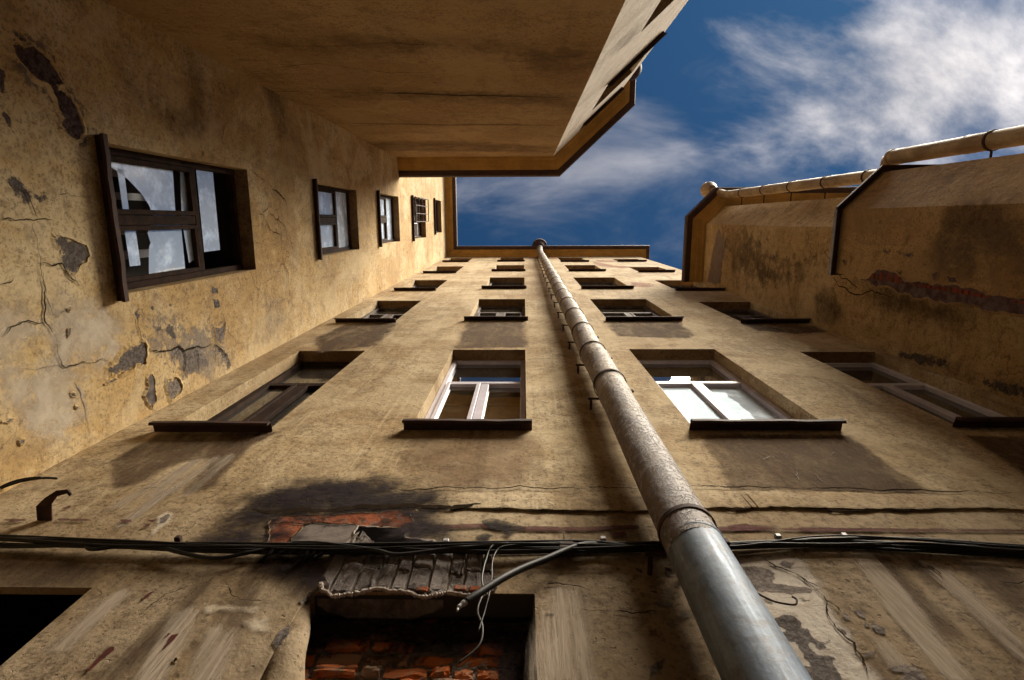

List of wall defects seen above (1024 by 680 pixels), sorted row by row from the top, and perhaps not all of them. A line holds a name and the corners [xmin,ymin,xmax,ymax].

peeling [0,30,97,146]
spalling [8,177,47,204]
crack [2,190,112,426]
spalling [50,231,92,278]
crack [826,254,894,297]
flaking render [859,268,1024,317]
spalling [103,287,231,410]
flaking render [266,509,437,543]
spalling [745,560,818,603]
crack [765,559,876,679]
spalling [775,614,842,680]